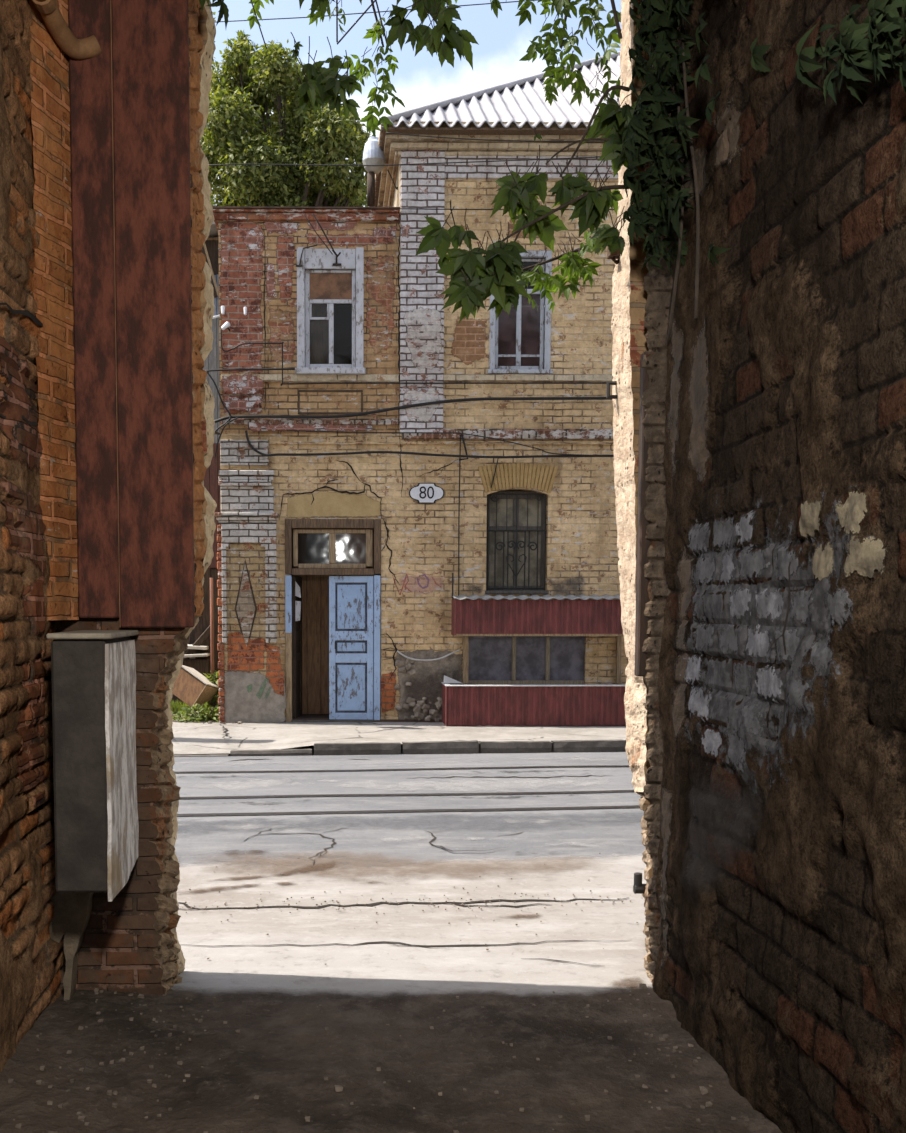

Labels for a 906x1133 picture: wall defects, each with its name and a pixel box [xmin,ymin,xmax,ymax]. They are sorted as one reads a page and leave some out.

peeling [218,221,487,432]
crack [279,213,458,592]
spalling [224,632,286,723]
crack [381,633,398,678]
peeling [680,485,888,802]
crack [244,833,336,856]
crack [425,830,505,851]
crack [179,898,626,909]
crack [181,939,625,947]